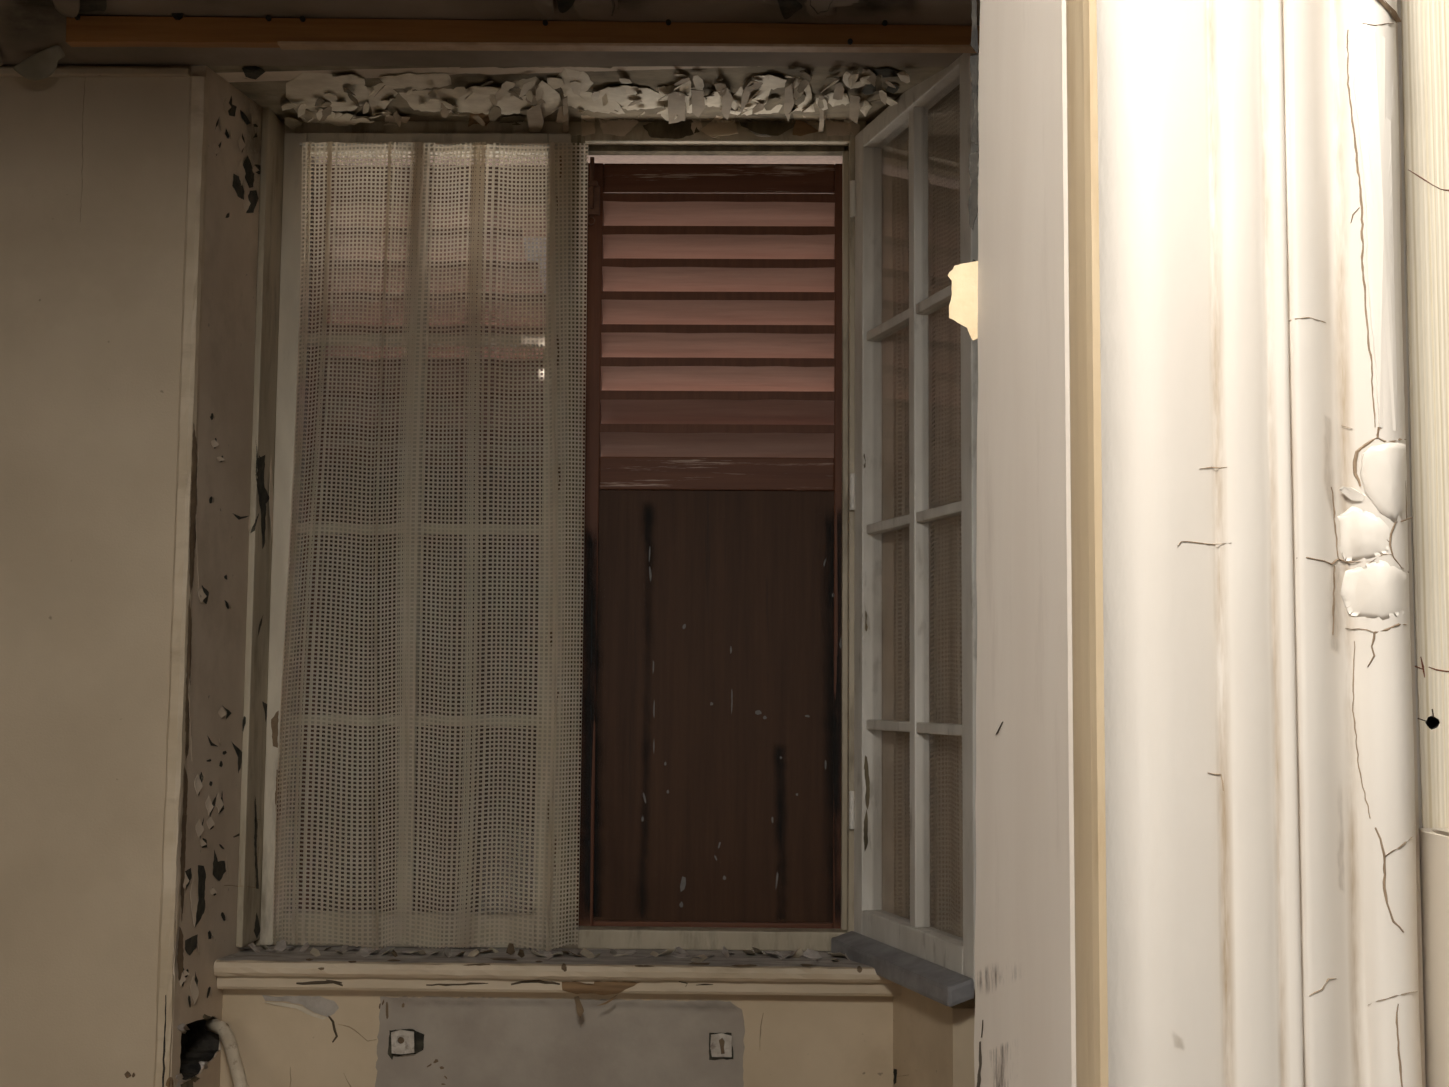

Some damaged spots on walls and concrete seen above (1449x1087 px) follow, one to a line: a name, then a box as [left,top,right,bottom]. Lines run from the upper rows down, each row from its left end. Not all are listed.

peeling [213,66,910,218]
peeling [234,446,273,549]
crack [1306,23,1413,933]
peeling [166,424,246,1087]
peeling [262,701,279,748]
crack [296,979,343,987]
crack [1369,991,1418,1087]